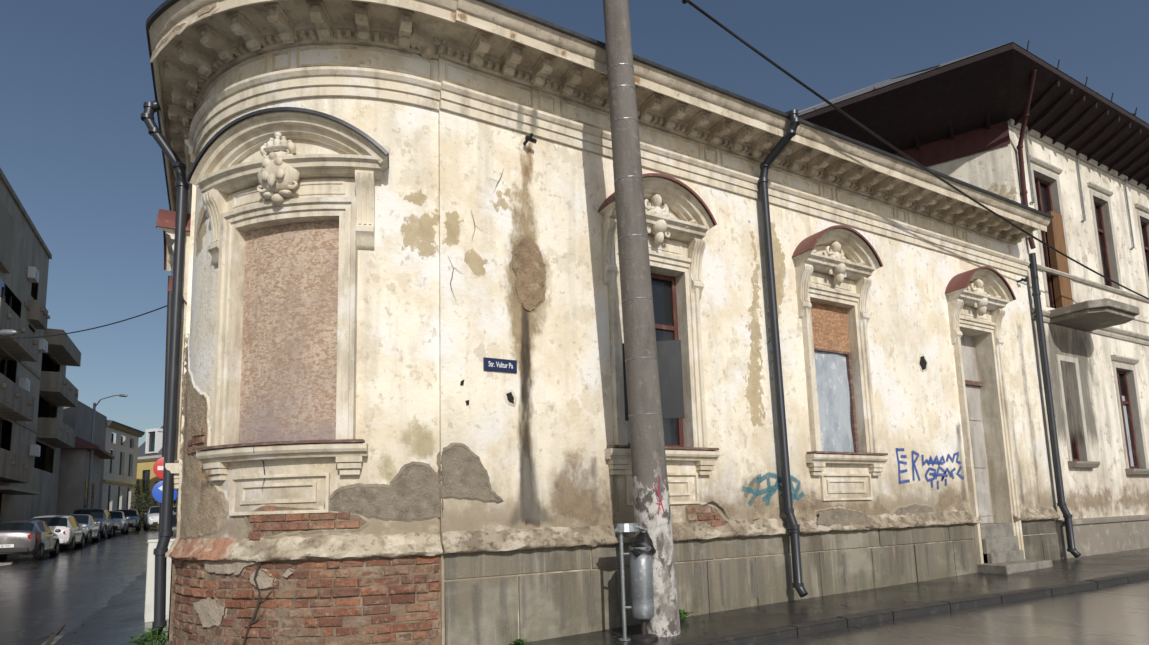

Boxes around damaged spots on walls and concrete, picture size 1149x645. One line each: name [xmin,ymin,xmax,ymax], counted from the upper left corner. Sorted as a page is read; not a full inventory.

peeling [196,203,206,256]
peeling [401,190,487,276]
peeling [176,326,504,541]
damp [515,306,600,524]
spalling [203,560,294,590]